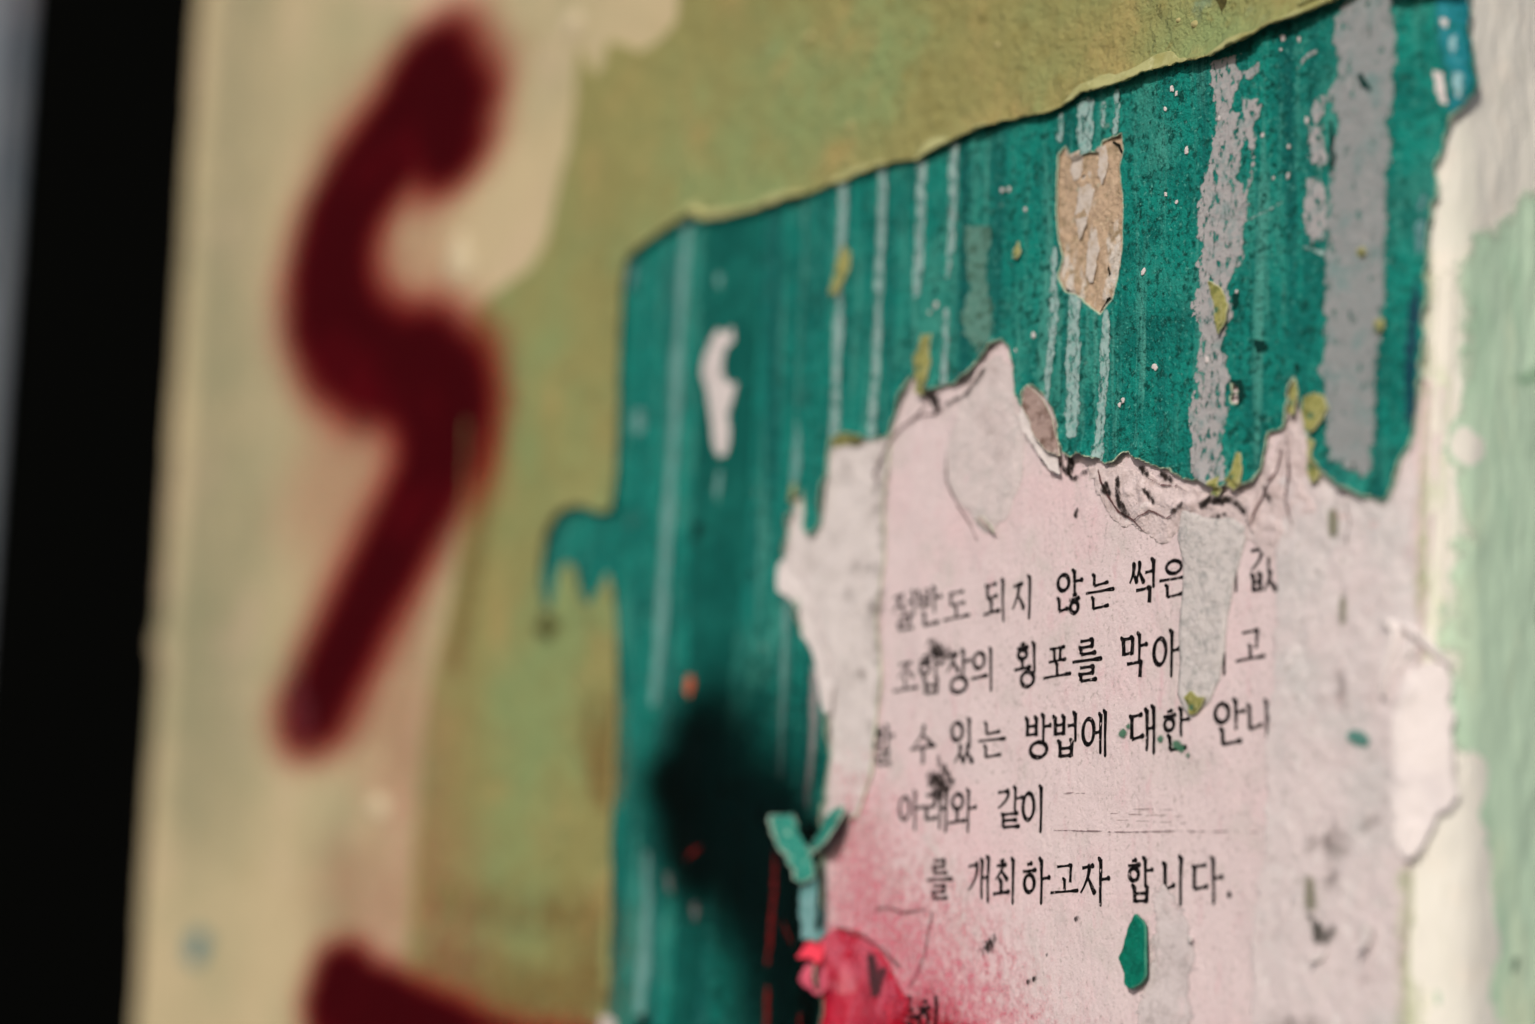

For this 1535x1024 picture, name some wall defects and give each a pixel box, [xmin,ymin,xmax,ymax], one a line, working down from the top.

peeling [540,0,1479,1024]